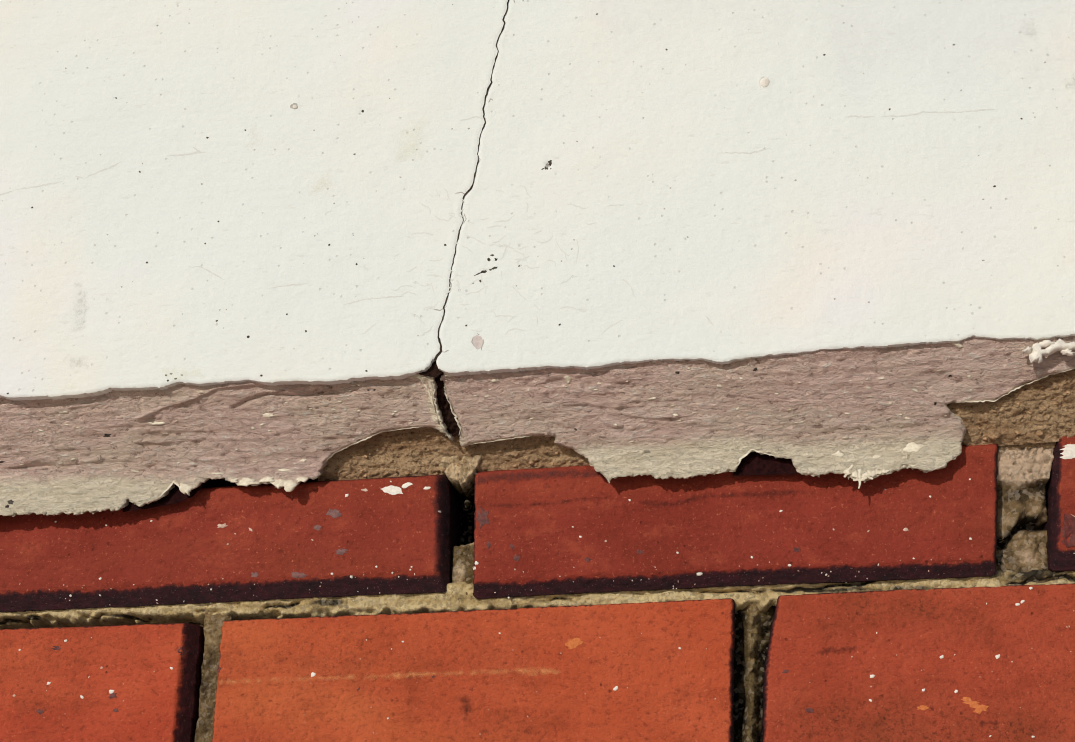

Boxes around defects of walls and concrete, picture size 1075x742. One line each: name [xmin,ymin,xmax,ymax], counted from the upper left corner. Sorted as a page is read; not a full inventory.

crack [343,0,621,438]
spalling [934,339,1075,446]
spalling [122,422,589,512]
spalling [733,449,798,476]
peeling [831,451,890,489]
peeling [902,442,924,453]